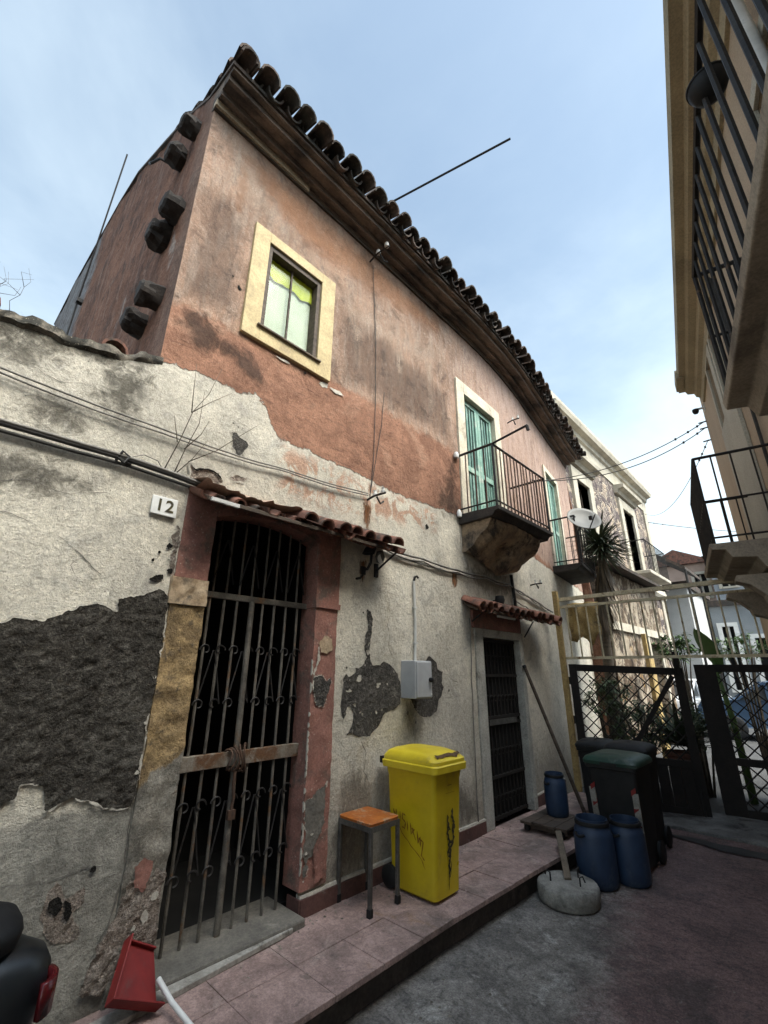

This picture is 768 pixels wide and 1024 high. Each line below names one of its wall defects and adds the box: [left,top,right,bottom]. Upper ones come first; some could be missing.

water stain [185,312,262,382]
flaking render [188,462,248,485]
flaking render [231,422,249,456]
flaking render [0,525,181,812]
flaking render [299,609,450,884]
flaking render [40,881,85,944]
flaking render [78,858,166,998]